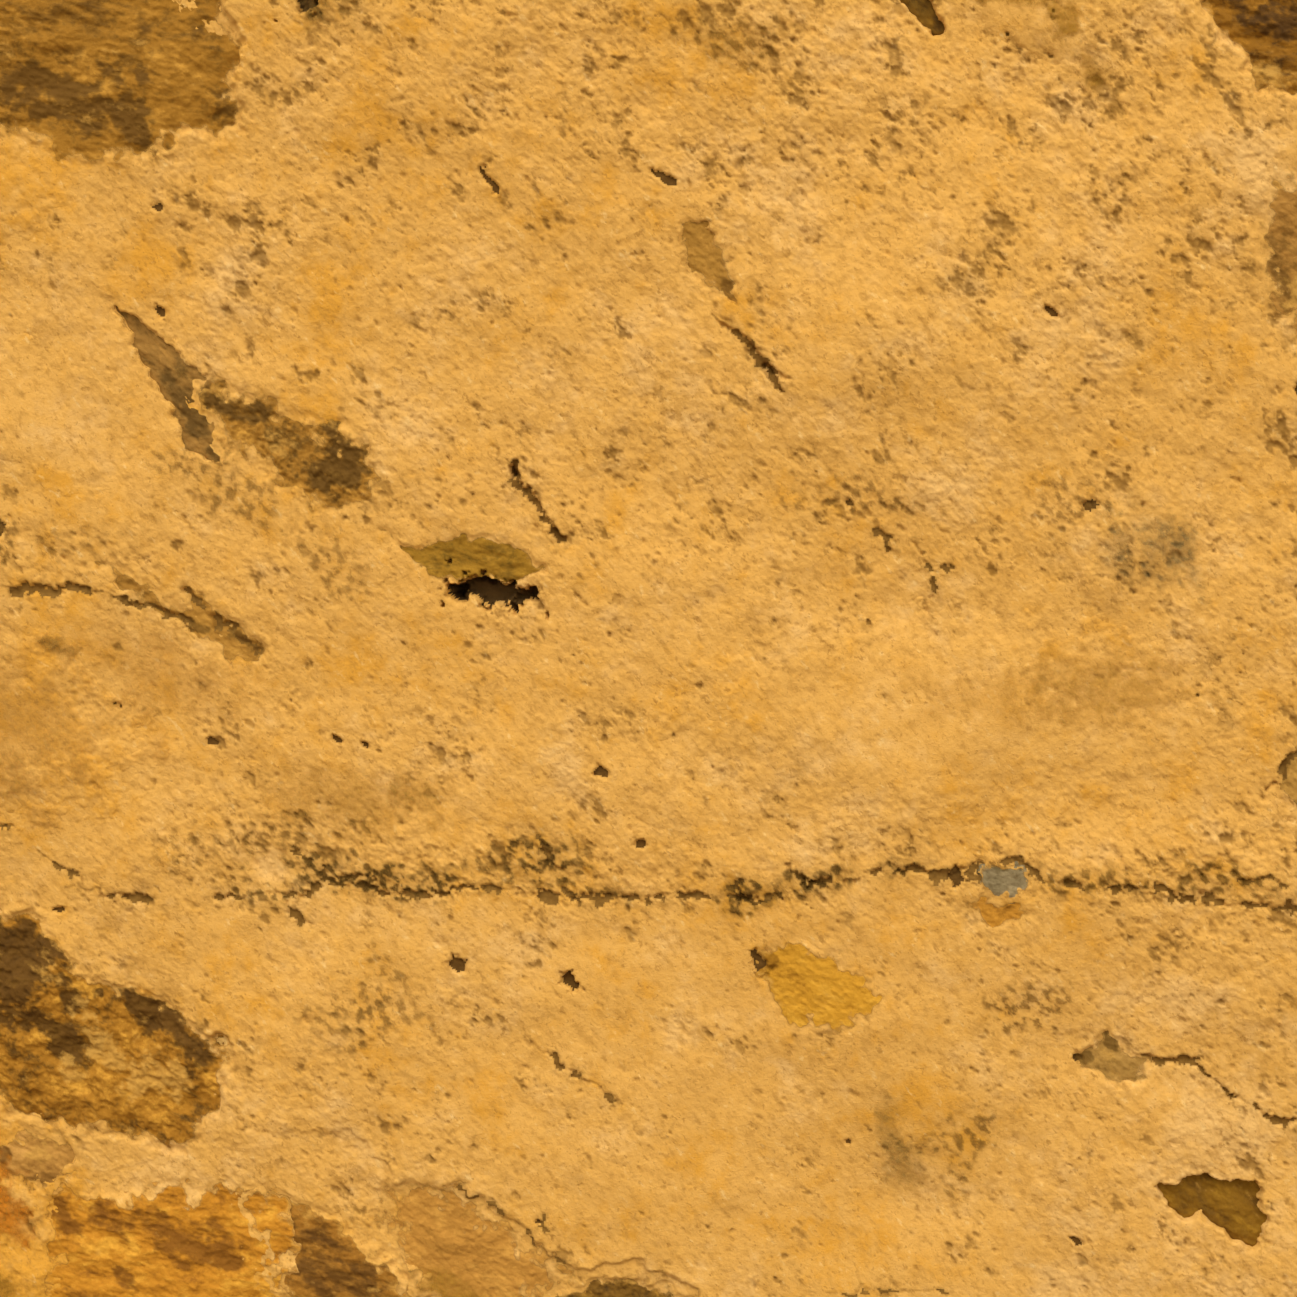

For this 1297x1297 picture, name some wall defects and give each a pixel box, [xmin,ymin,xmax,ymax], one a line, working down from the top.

flaking render [0,0,257,178]
flaking render [1167,0,1297,106]
flaking render [1243,166,1297,361]
flaking render [100,288,556,613]
crack [107,892,153,905]
crack [283,845,502,927]
crack [536,834,832,909]
crack [870,856,1297,916]
flaking render [0,899,710,1297]
crack [1152,1055,1296,1128]
crack [456,1185,566,1264]
flaking render [1157,1173,1267,1247]